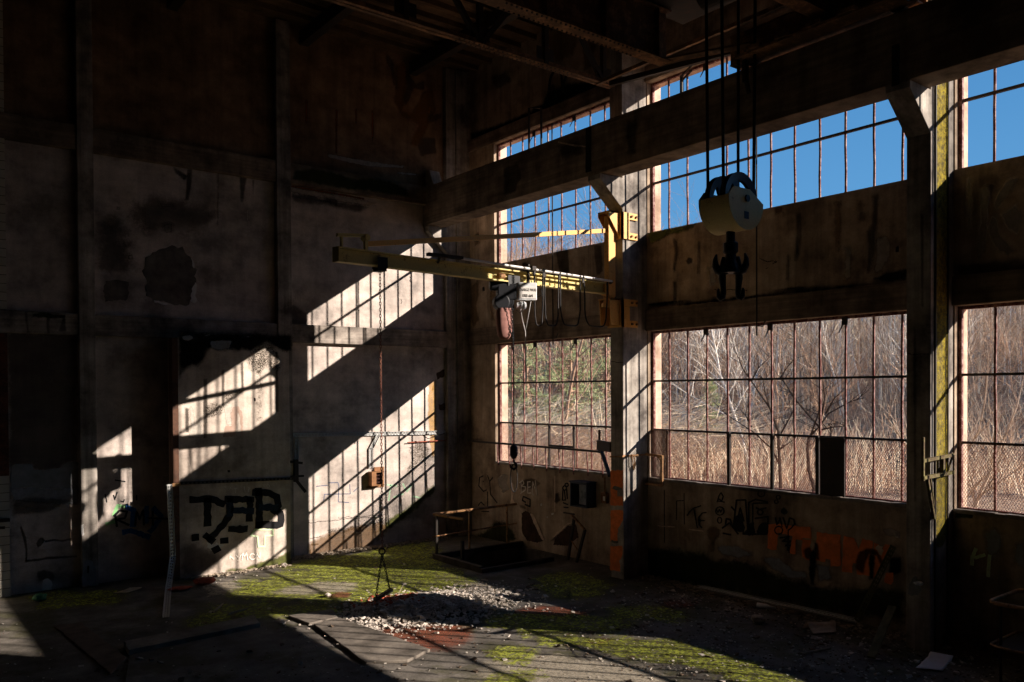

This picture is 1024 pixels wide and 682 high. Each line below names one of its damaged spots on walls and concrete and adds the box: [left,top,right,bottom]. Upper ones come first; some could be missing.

spalling [142,245,197,306]